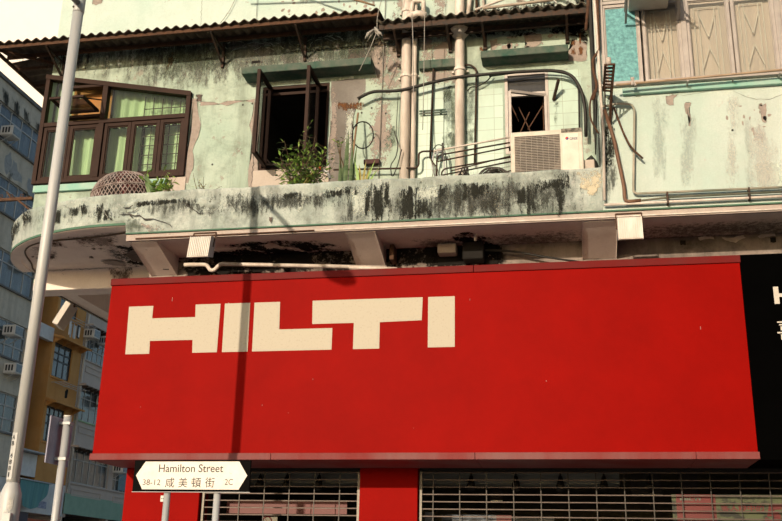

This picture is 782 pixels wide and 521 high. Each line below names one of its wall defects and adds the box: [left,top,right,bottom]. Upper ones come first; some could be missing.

damp [470,22,589,44]
damp [77,30,402,173]
damp [227,88,616,221]
damp [11,211,43,245]
damp [55,203,115,223]
damp [136,198,211,215]
damp [73,234,144,279]